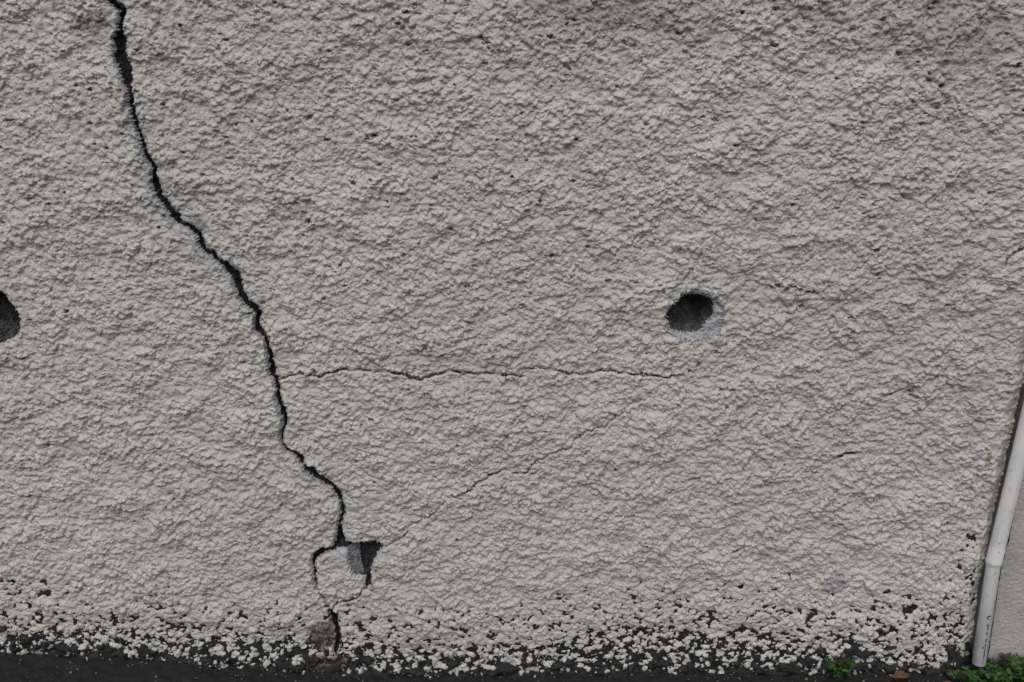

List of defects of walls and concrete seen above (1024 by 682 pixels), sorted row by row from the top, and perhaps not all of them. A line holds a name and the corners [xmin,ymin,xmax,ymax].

crack [105,0,681,650]
spalling [664,292,727,344]
peeling [0,515,978,680]